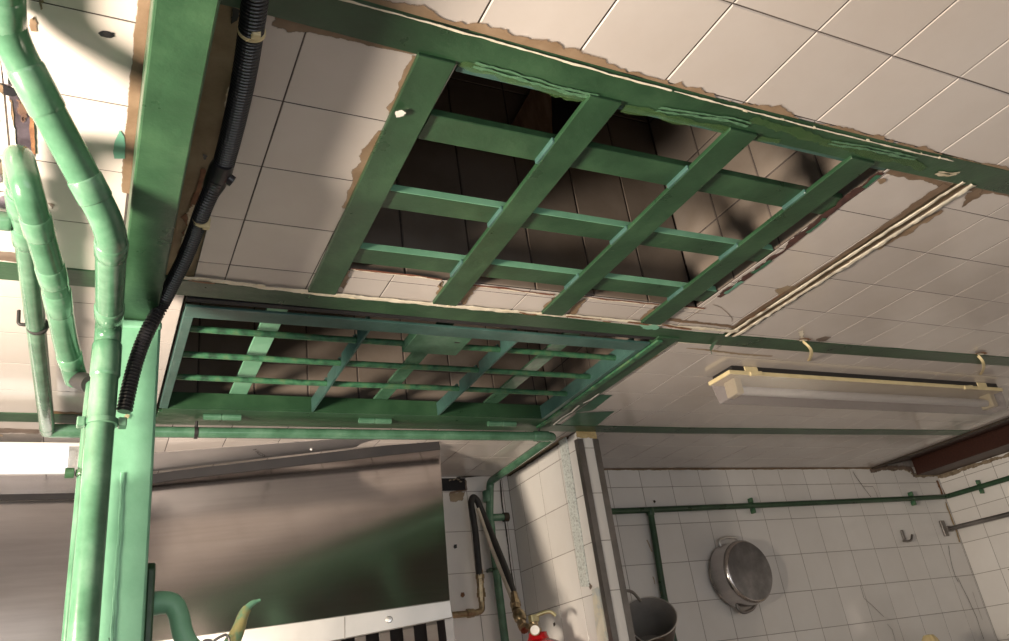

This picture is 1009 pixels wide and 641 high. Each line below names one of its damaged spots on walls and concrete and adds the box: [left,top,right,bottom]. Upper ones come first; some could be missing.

flaking render [184,0,975,337]
spalling [870,453,1009,478]